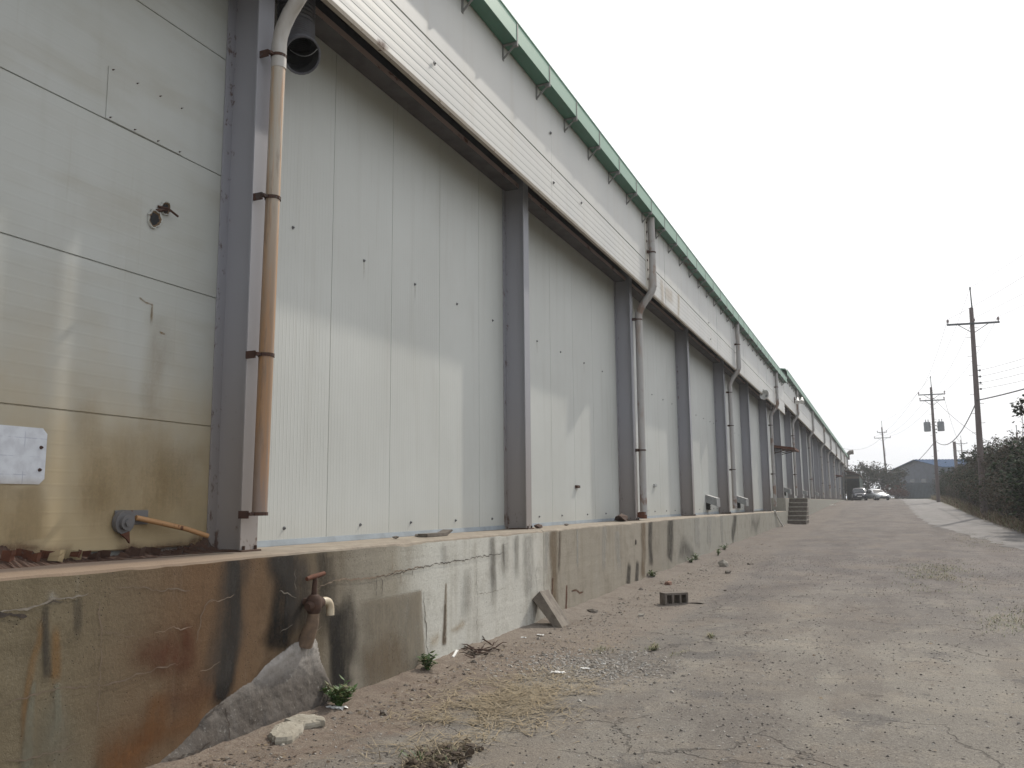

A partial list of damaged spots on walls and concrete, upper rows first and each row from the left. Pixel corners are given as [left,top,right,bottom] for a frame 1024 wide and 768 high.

crack [0,594,87,619]
damp [214,560,241,702]
damp [268,555,308,648]
damp [323,584,356,688]
crack [281,551,507,639]
damp [545,531,560,600]
damp [627,522,653,584]